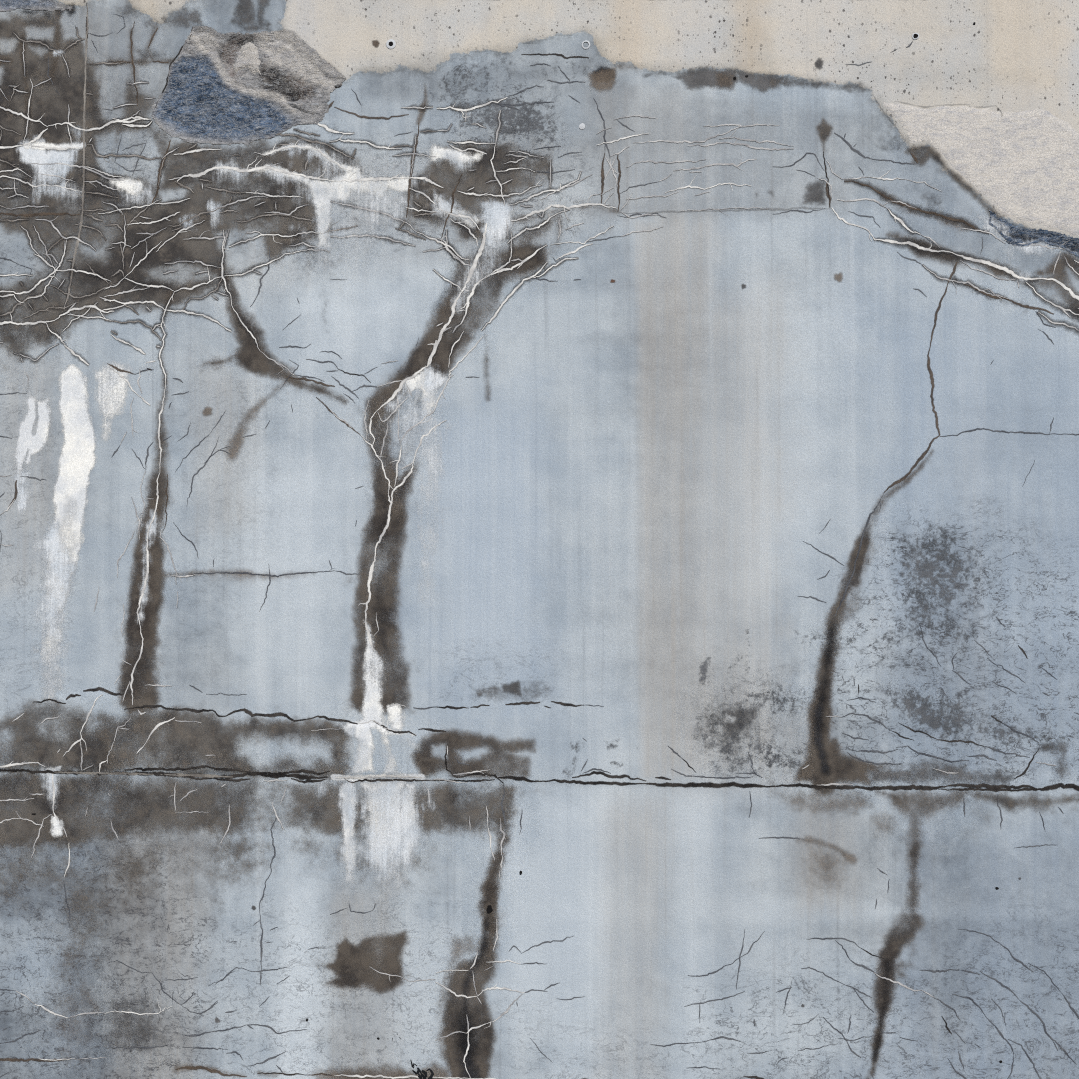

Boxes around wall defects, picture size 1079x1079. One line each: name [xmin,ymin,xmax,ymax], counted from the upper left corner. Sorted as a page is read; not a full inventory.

spalling [0,0,73,11]
spalling [151,26,346,145]
damp [817,119,832,142]
spalling [883,102,1079,257]
crack [0,14,1079,877]
damp [0,13,555,1079]
damp [796,528,875,807]
crack [63,849,71,927]
crack [209,803,286,986]
crack [0,919,573,1079]
crack [650,929,1079,1079]
damp [868,792,1079,1079]